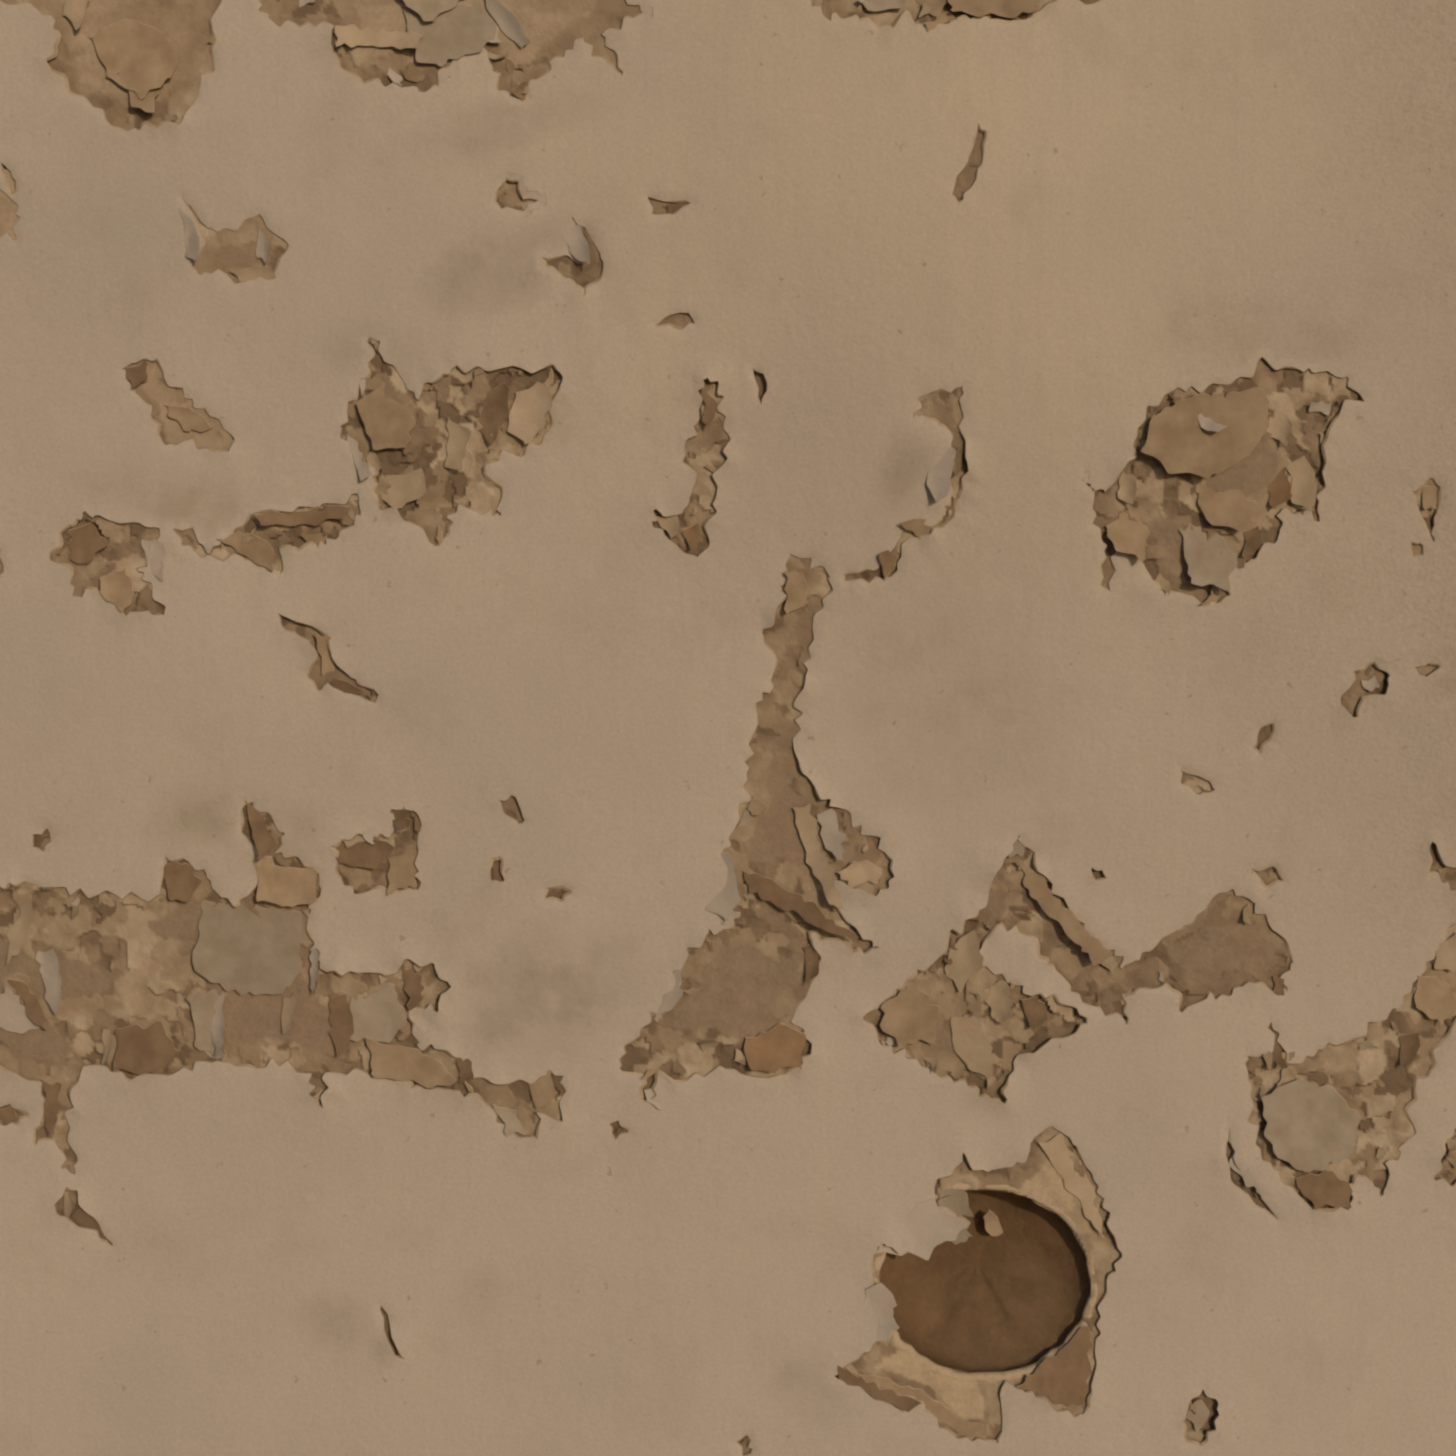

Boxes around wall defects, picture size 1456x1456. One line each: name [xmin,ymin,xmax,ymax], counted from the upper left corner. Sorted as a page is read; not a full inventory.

peeling [1,0,221,131]
peeling [260,0,641,101]
peeling [811,0,1054,32]
peeling [178,206,288,283]
peeling [50,339,562,615]
peeling [1086,358,1362,605]
peeling [279,614,378,702]
peeling [620,379,968,1110]
peeling [0,801,565,1244]
peeling [863,839,1291,1103]
peeling [1228,924,1456,1209]
spalling [876,1132,1104,1406]